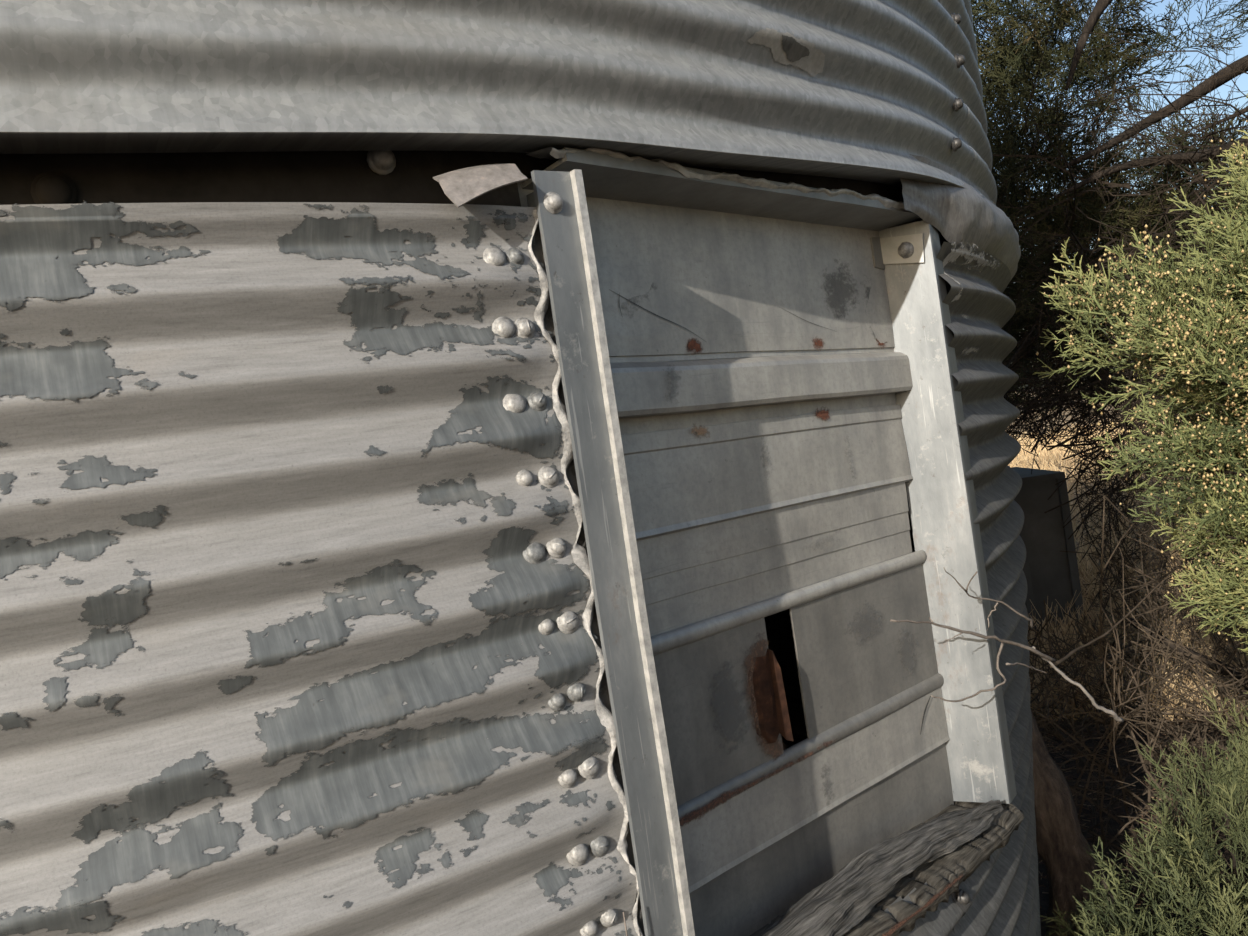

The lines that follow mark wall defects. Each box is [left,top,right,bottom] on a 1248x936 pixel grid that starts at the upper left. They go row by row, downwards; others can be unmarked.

peeling [747,28,825,77]
peeling [0,200,210,313]
peeling [278,203,555,364]
peeling [0,328,160,403]
corrosion [687,338,702,353]
peeling [0,468,41,495]
peeling [57,455,157,492]
peeling [364,445,388,457]
peeling [421,375,574,525]
peeling [0,473,615,936]
corrosion [679,639,832,826]
peeling [533,857,631,924]